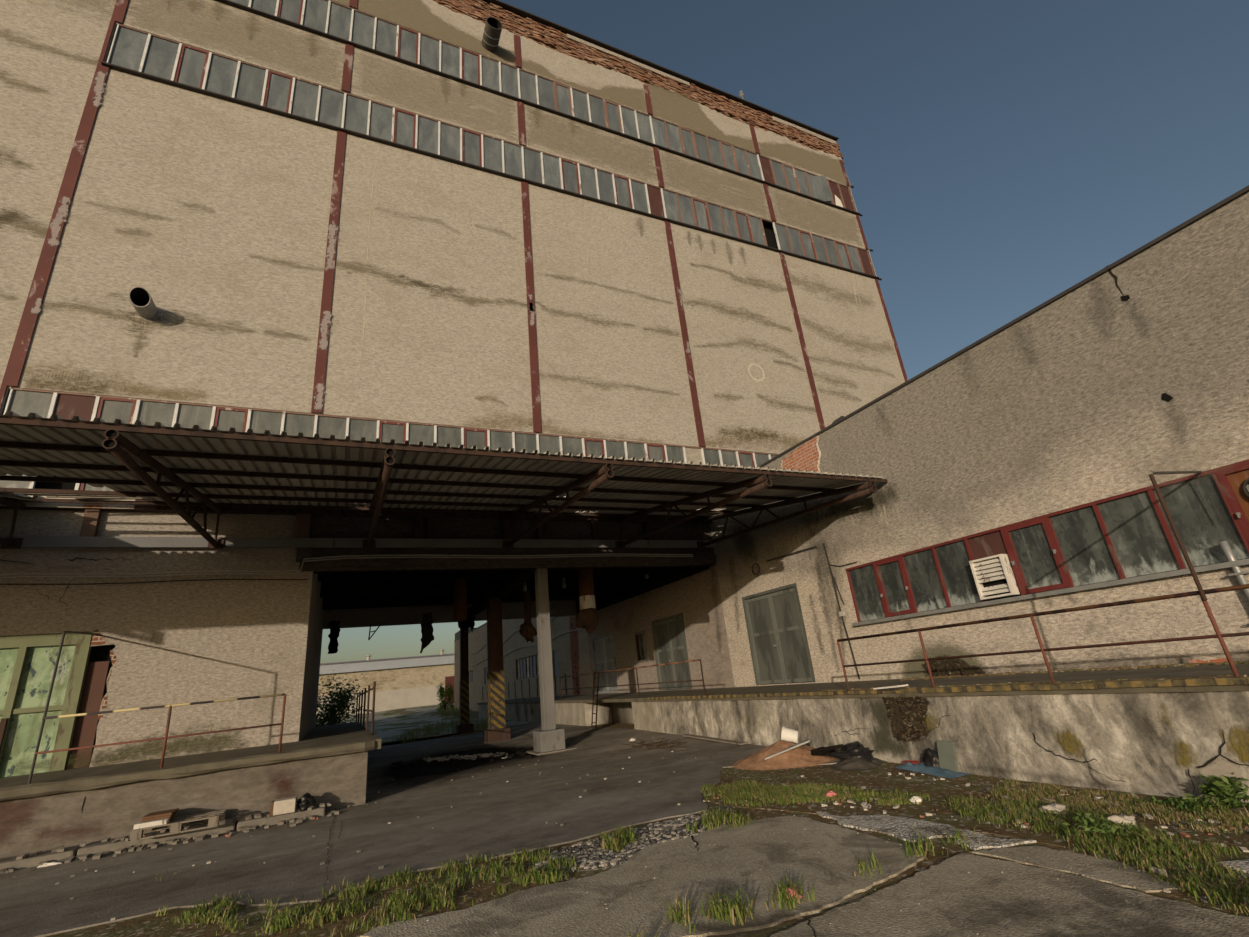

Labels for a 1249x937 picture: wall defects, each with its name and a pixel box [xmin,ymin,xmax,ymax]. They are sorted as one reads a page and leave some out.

peeling [92,71,105,107]
leakage [0,209,47,236]
peeling [48,196,71,247]
peeling [31,298,42,314]
leakage [685,301,791,331]
crack [1033,733,1127,783]
crack [1187,731,1249,794]